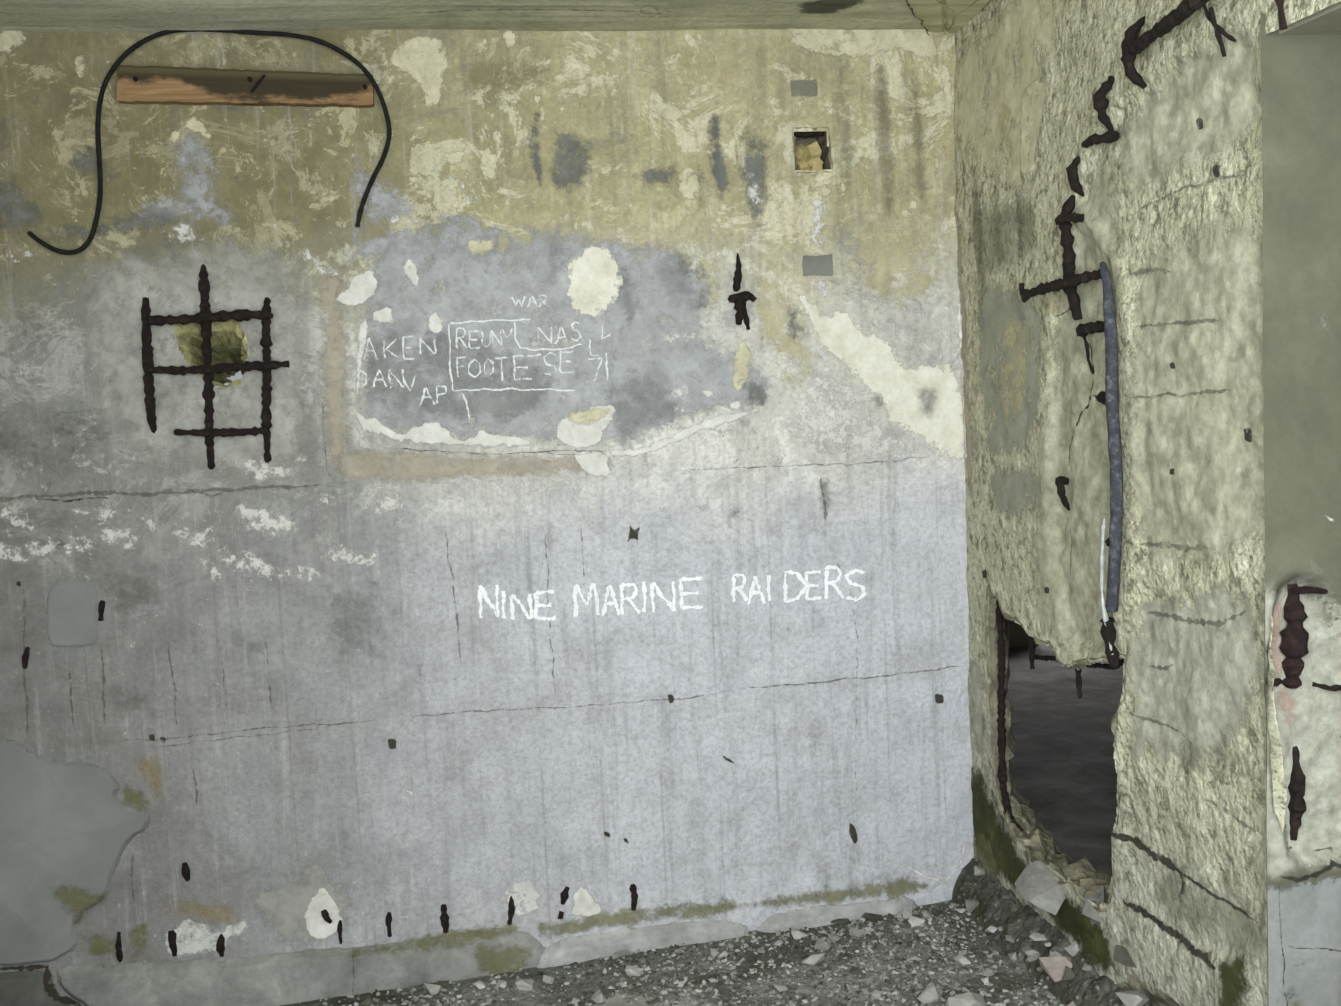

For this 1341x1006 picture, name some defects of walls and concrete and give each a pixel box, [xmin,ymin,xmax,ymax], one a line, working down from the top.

peeling [0,31,26,53]
peeling [170,117,211,143]
peeling [389,36,449,107]
flaking render [786,0,1064,189]
spalling [86,223,395,480]
peeling [356,412,531,447]
peeling [496,246,760,493]
flaking render [799,184,973,499]
spalling [982,0,1341,912]
corrosion [1272,603,1282,670]
spalling [849,823,857,844]
crack [1110,831,1341,1006]